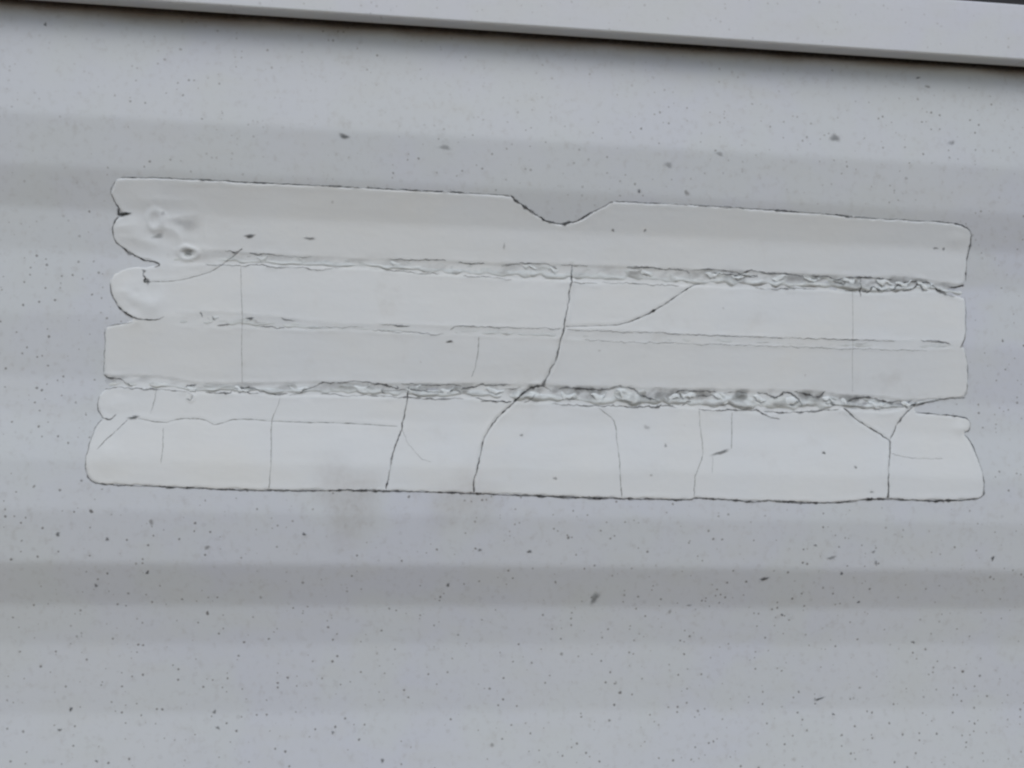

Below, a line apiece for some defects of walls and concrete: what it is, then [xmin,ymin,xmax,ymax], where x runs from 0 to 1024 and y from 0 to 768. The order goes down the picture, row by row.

crack [111,177,972,288]
crack [85,273,985,504]